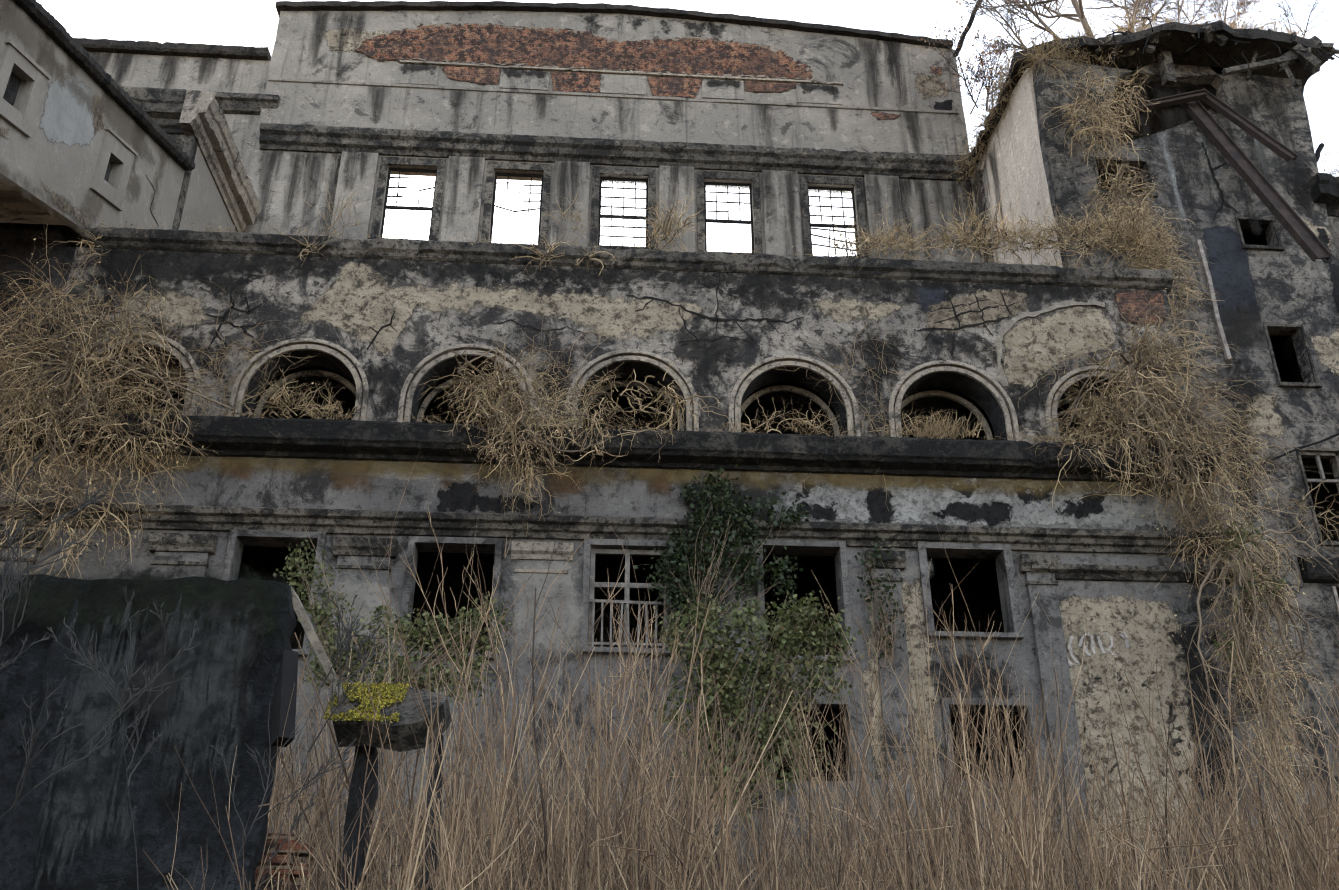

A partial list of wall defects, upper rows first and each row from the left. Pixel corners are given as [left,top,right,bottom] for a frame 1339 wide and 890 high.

water stain [314,13,364,76]
water stain [373,87,384,119]
water stain [401,63,436,75]
water stain [503,68,549,78]
spalling [353,22,816,98]
water stain [660,20,727,40]
water stain [706,78,740,88]
water stain [799,83,838,129]
water stain [859,39,919,153]
crack [628,272,804,347]
spalling [923,289,1166,388]
water stain [1223,304,1264,347]